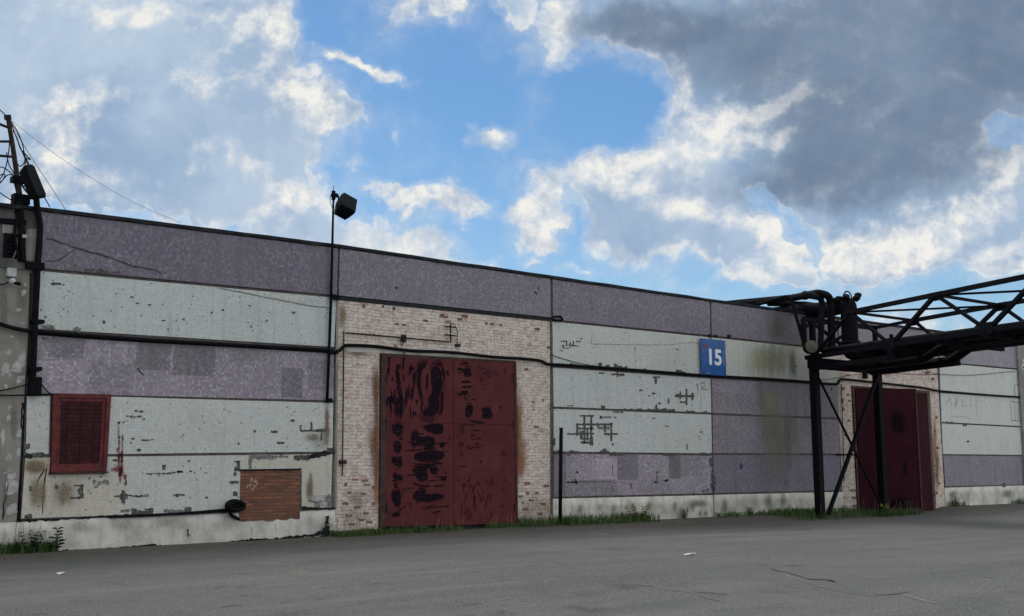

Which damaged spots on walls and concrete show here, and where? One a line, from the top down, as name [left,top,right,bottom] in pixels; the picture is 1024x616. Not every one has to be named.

crack [46,238,161,274]
peeling [1,335,26,389]
spalling [532,370,707,456]
peeling [0,414,109,523]
spalling [70,410,192,515]
spalling [229,419,335,496]
peeling [518,482,549,515]
spalling [700,452,716,492]